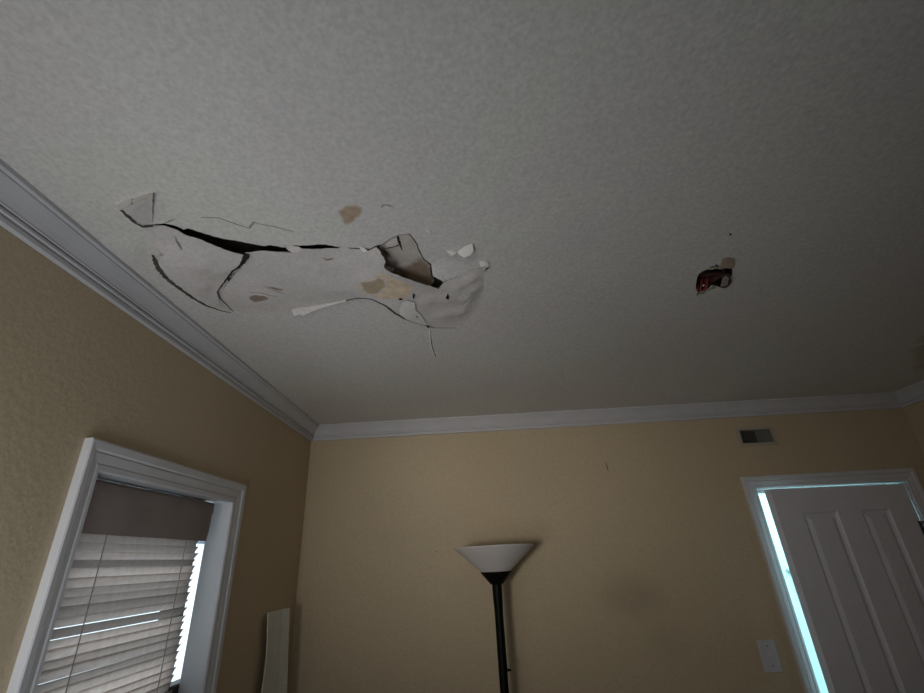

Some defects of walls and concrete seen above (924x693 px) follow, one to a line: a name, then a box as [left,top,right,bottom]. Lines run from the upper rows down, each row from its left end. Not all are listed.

crack [120,210,377,306]
flaking render [380,233,443,288]
peeling [447,244,489,267]
damp [355,273,417,301]
hole [696,268,732,292]
peeling [292,298,364,316]